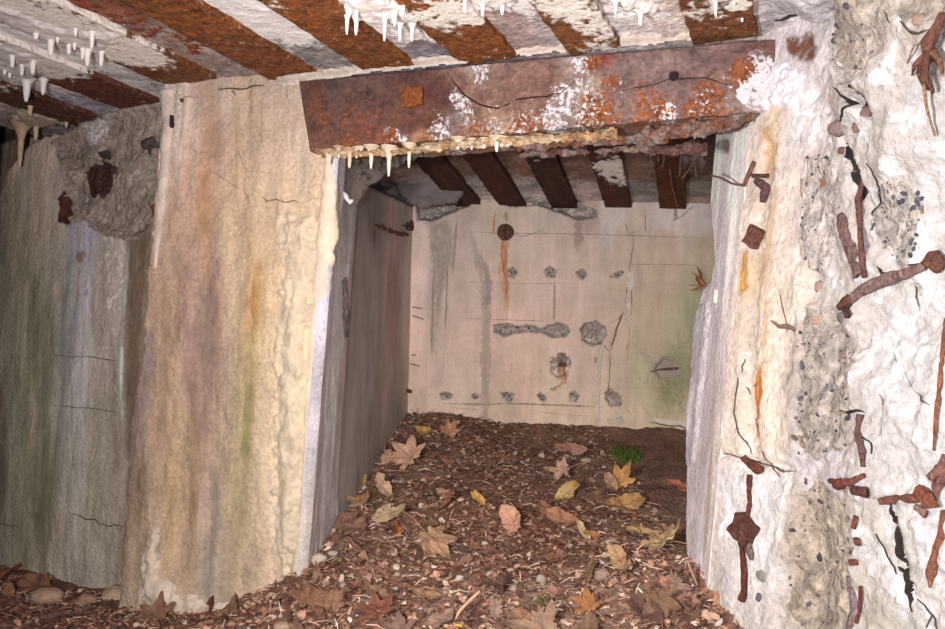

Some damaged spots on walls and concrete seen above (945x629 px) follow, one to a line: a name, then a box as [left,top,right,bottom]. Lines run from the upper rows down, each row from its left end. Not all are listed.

water stain [338,0,418,42]
water stain [276,55,469,86]
water stain [504,44,567,58]
water stain [0,43,68,167]
rust [836,179,945,319]
crack [52,354,116,366]
spalling [493,320,608,363]
spalling [537,357,572,402]
rust [827,318,945,588]
crack [72,513,123,531]
rust [726,454,764,603]
crack [875,504,938,629]